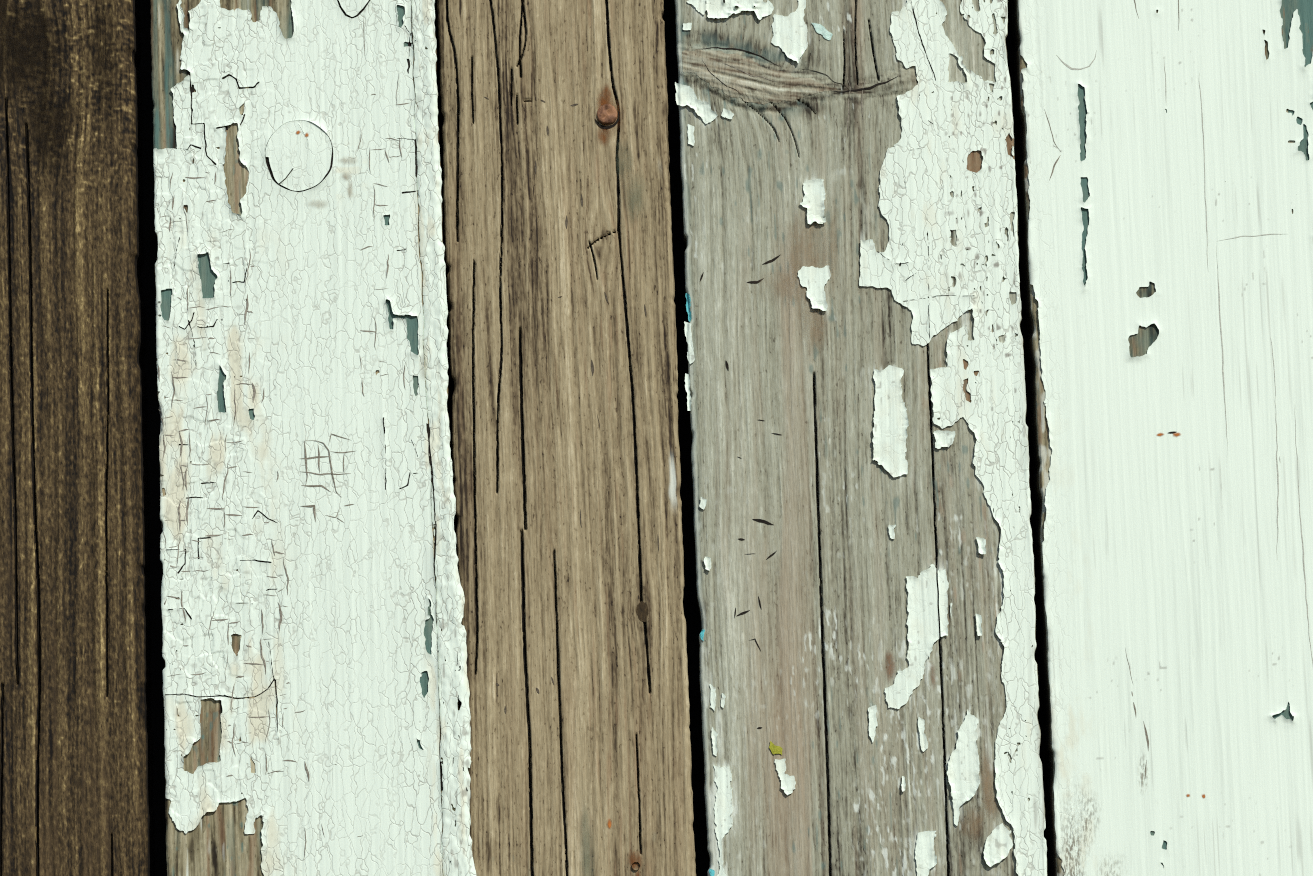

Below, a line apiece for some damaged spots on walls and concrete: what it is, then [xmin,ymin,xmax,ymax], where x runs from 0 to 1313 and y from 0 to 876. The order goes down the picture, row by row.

peeling [150,0,201,149]
crack [357,26,419,289]
rust [600,87,610,106]
peeling [683,0,833,63]
crack [157,73,353,780]
crack [360,318,437,572]
crack [446,0,659,876]
peeling [872,365,909,477]
crack [877,231,974,876]
peeling [868,564,952,742]
peeling [165,796,264,876]
peeling [947,709,980,826]